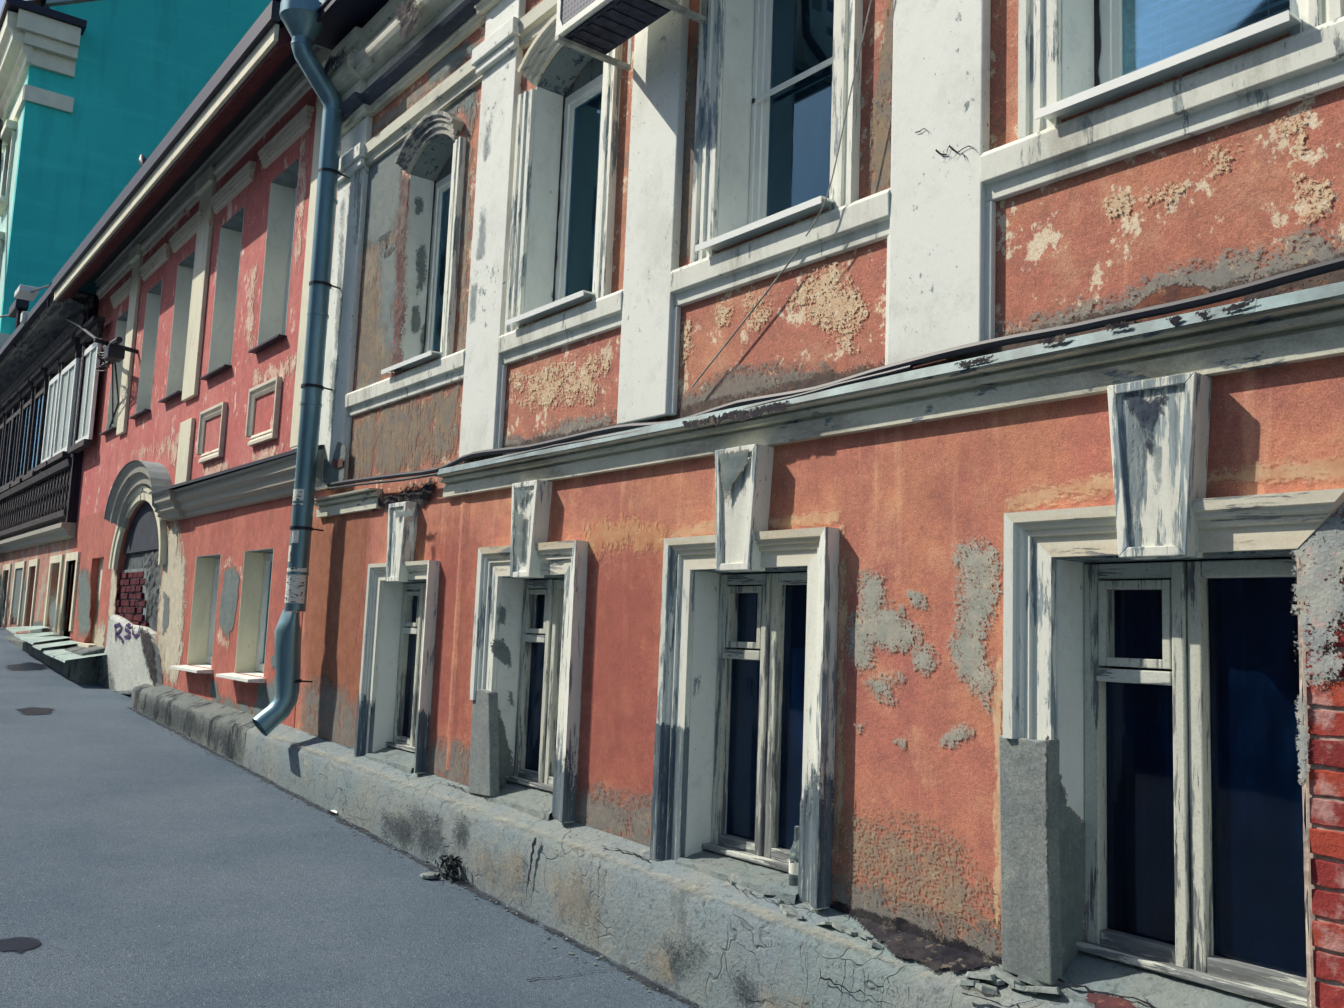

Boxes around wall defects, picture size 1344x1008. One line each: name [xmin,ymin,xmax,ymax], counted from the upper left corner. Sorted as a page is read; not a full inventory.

peeling [371,34,483,139]
peeling [444,88,492,351]
peeling [995,111,1344,335]
peeling [322,141,461,487]
peeling [507,350,613,416]
peeling [677,256,870,411]
peeling [844,534,1004,717]
crack [524,815,554,902]
peeling [650,722,689,861]
flaking render [1290,502,1344,1008]
crack [727,879,909,1008]
crack [962,978,1156,1008]